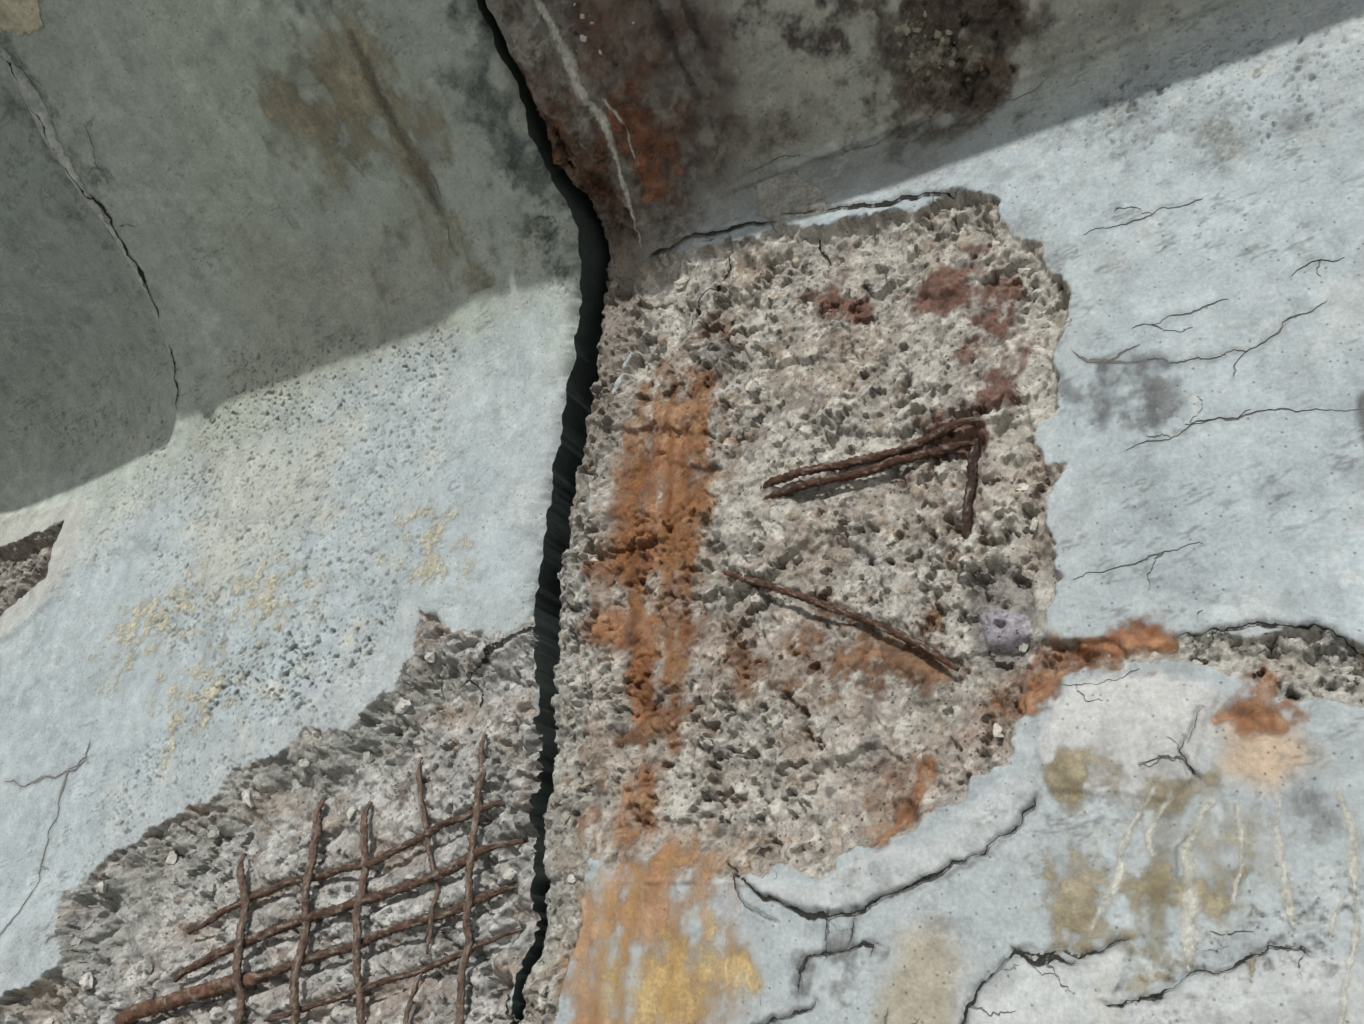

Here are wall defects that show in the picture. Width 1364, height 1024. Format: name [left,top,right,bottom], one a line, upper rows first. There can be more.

water stain [534,0,642,247]
water stain [781,0,1053,143]
crack [650,189,959,325]
corrosion [903,245,1031,471]
spalling [0,521,64,617]
corrosion [563,366,761,1024]
spalling [519,107,1364,1024]
corrosion [993,619,1178,716]
spalling [0,610,543,1024]
crack [727,797,1036,1024]
crack [961,939,1127,1024]
water stain [1043,772,1255,990]